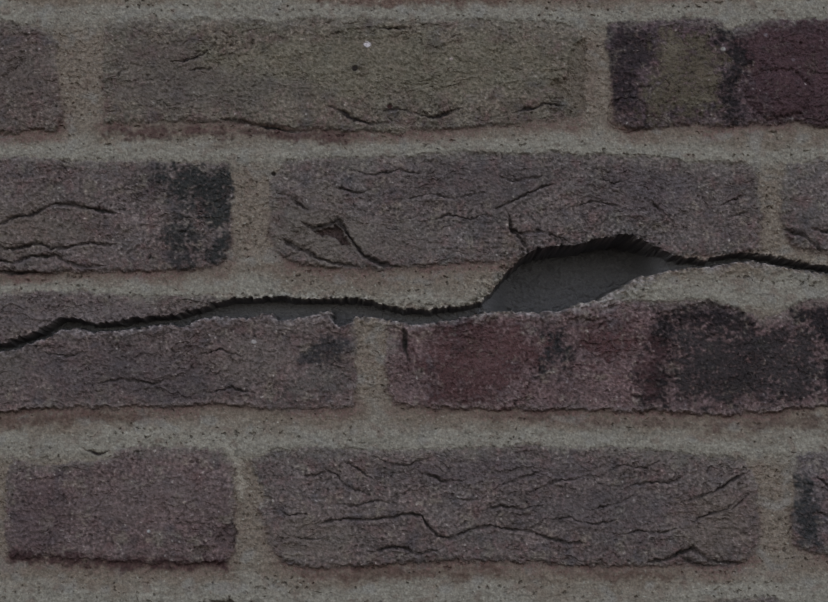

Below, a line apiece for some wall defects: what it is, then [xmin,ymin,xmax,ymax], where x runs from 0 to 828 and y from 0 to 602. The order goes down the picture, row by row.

crack [336,168,422,194]
crack [0,175,828,374]
crack [96,377,176,385]
crack [205,386,253,394]